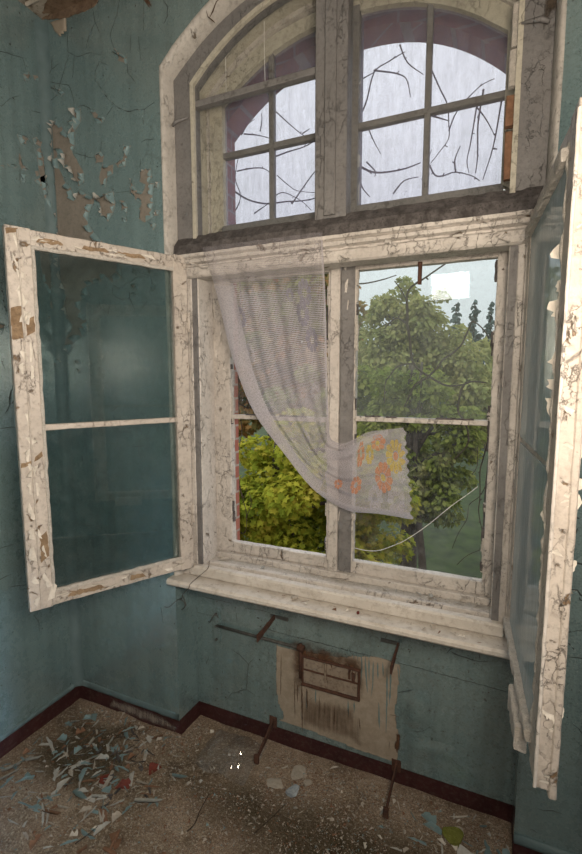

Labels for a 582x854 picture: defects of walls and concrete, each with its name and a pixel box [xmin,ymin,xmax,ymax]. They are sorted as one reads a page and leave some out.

spalling [42,0,98,36]
peeling [17,62,160,374]
corrosion [295,644,360,729]